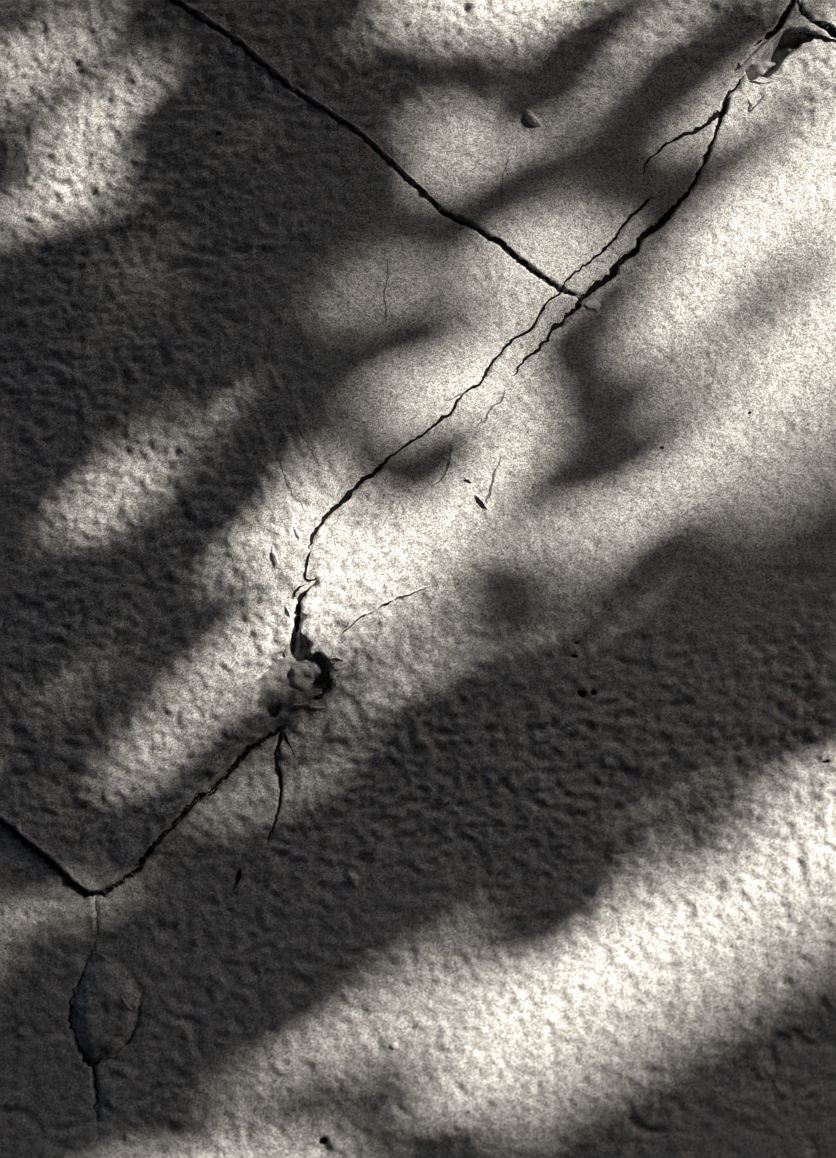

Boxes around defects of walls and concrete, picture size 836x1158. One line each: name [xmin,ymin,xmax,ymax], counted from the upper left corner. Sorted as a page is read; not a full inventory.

crack [169,0,836,644]
crack [0,725,296,899]